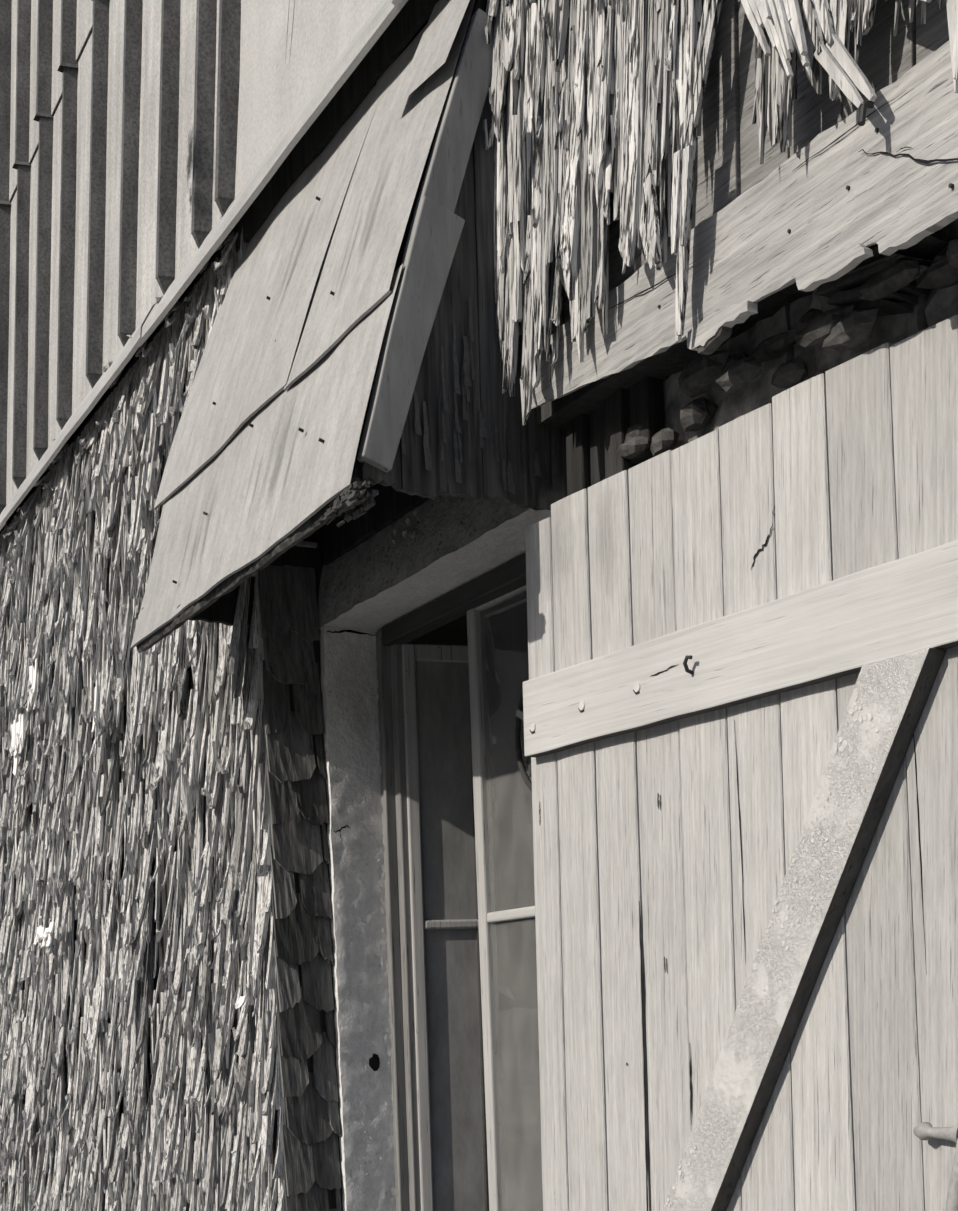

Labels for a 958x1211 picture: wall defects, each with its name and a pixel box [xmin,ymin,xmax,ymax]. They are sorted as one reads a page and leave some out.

crack [793,90,958,171]
crack [751,507,775,568]